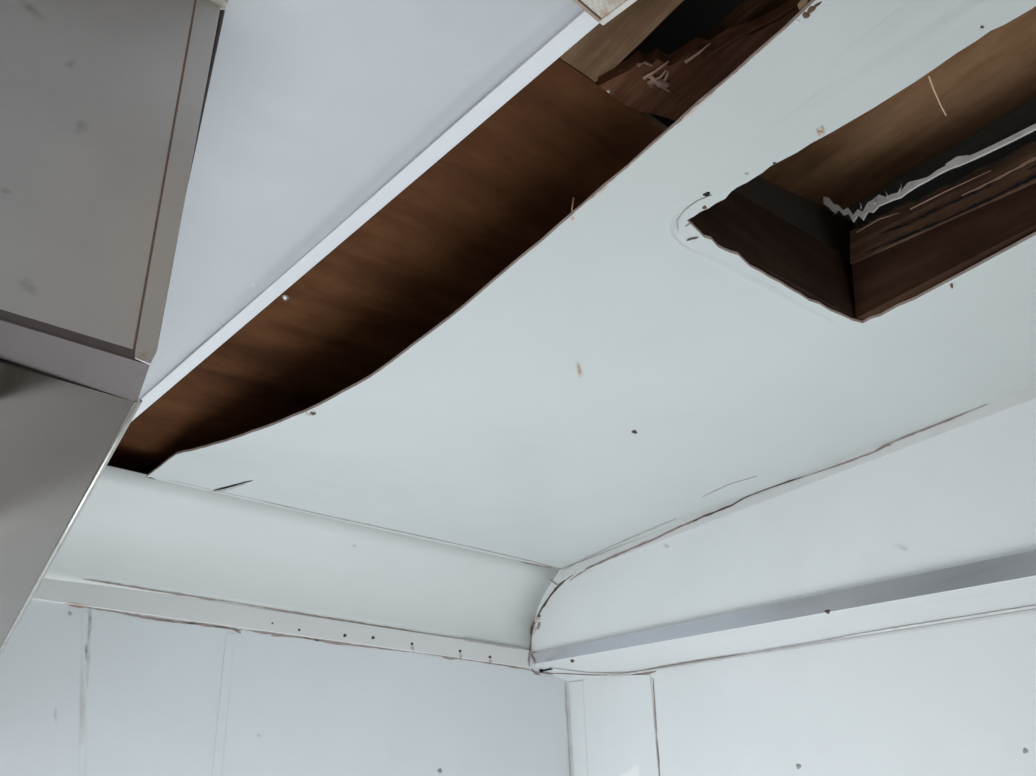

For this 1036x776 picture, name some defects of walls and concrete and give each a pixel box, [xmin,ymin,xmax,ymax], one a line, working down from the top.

peeling [795,0,822,24]